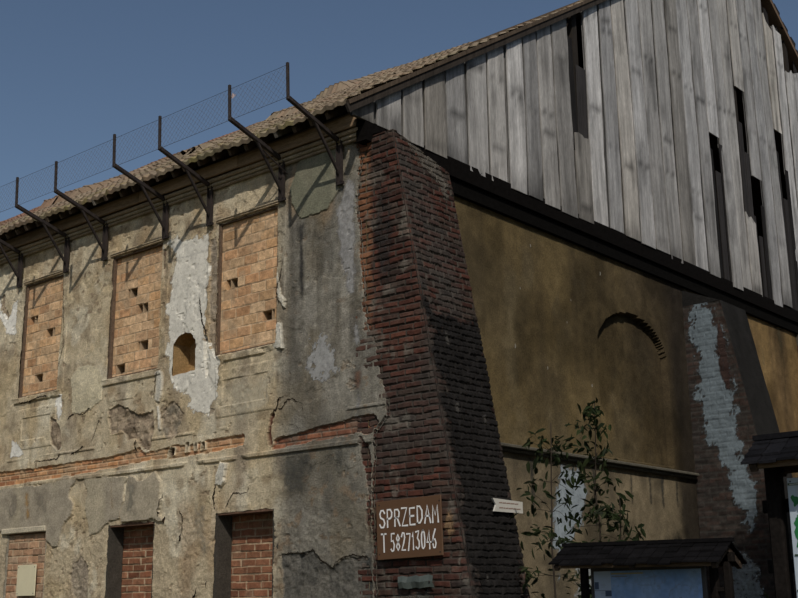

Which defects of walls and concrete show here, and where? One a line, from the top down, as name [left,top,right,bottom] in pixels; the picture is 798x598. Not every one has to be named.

flaking render [162,246,174,288]
flaking render [203,236,219,354]
peeling [305,333,340,383]
flaking render [0,369,245,548]
flaking render [270,413,379,540]
peeling [688,302,758,533]
flaking render [69,556,89,598]
crack [279,549,367,569]